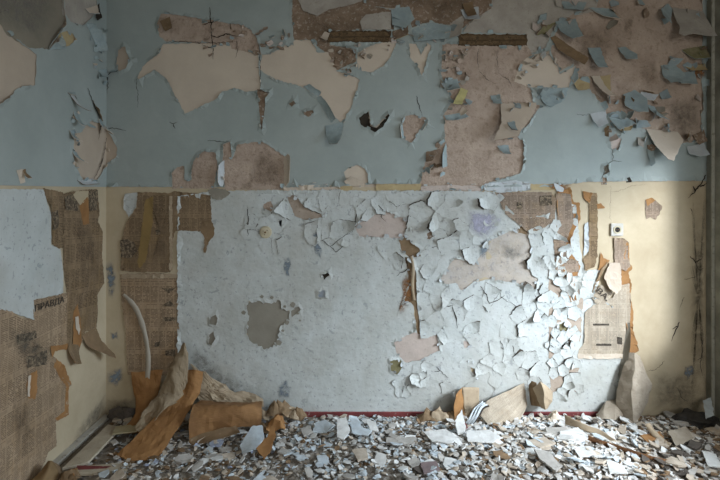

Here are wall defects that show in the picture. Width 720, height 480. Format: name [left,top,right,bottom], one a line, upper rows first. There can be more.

peeling [0,0,130,102]
crack [166,7,239,55]
peeling [68,92,117,185]
peeling [123,193,137,217]
spalling [138,0,718,402]